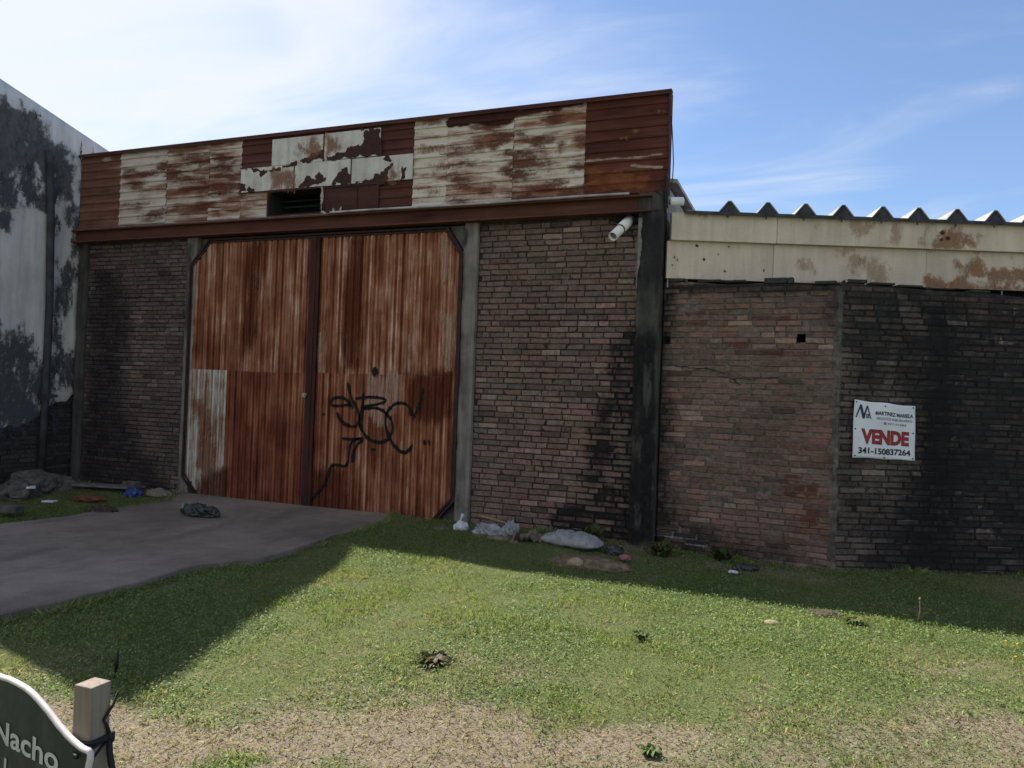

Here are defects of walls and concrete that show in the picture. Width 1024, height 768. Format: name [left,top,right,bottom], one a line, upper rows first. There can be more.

corrosion [122,153,244,222]
peeling [240,127,406,214]
corrosion [237,240,266,366]
corrosion [340,235,456,429]
corrosion [924,224,1024,290]
water stain [547,212,1024,575]
corrosion [193,399,229,497]
corrosion [310,467,349,510]